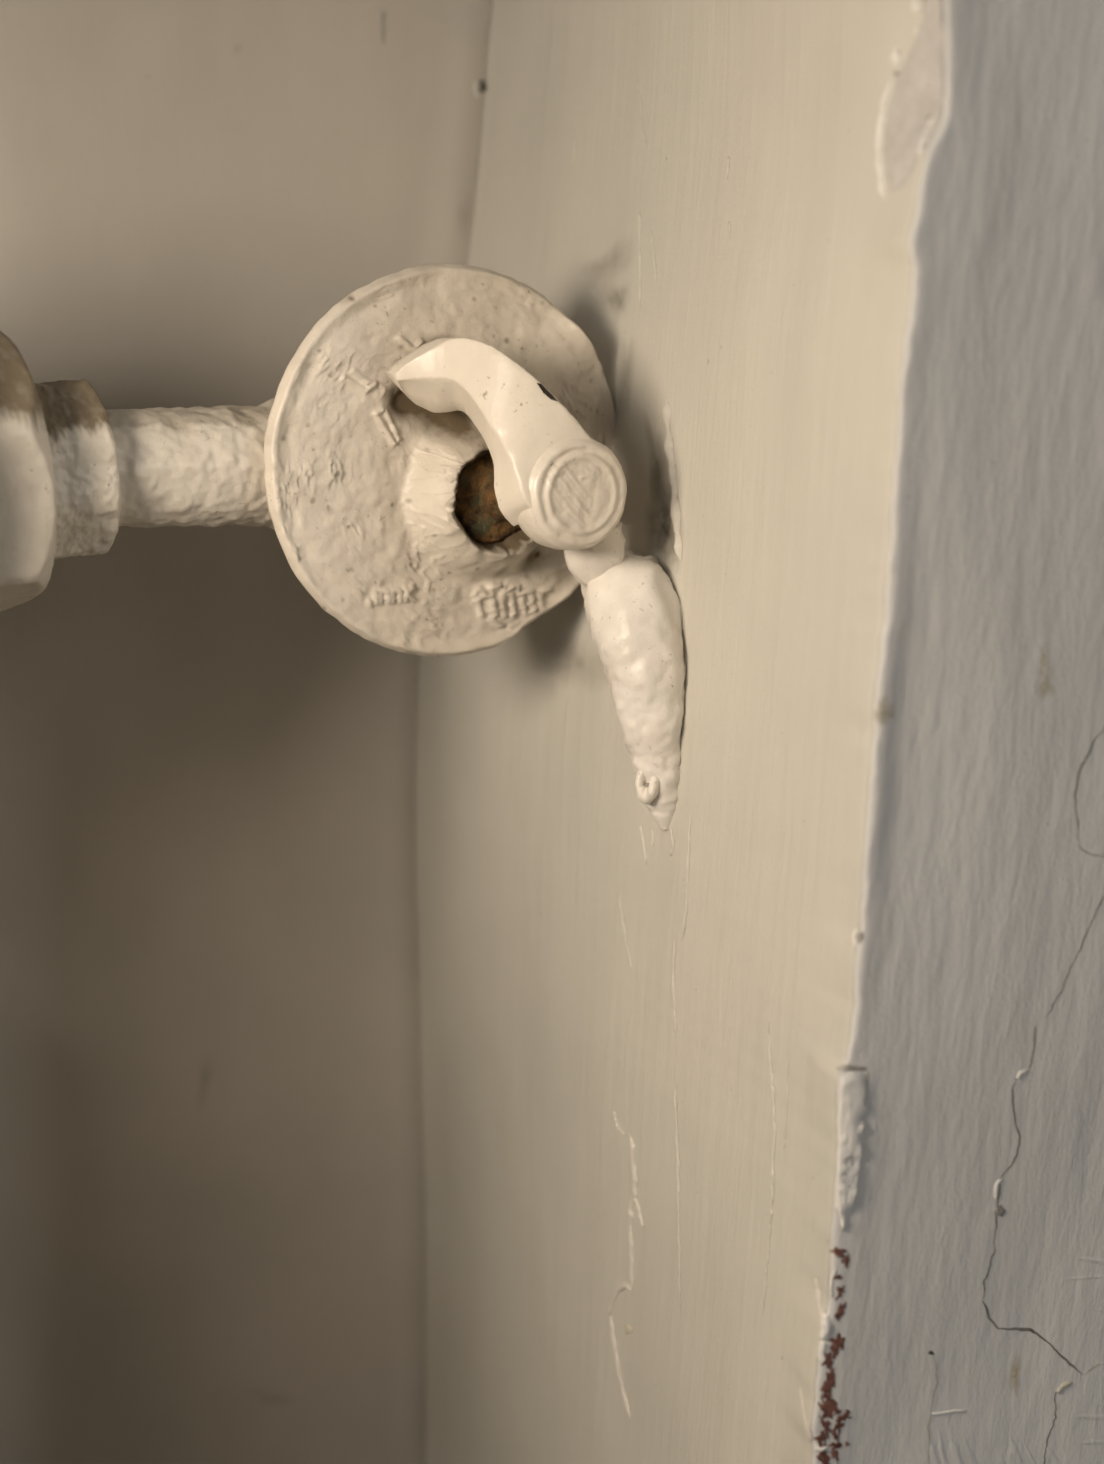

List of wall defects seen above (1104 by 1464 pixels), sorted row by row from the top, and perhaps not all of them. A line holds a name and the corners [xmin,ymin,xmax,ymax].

crack [1074,730,1104,857]
crack [982,897,1104,1464]